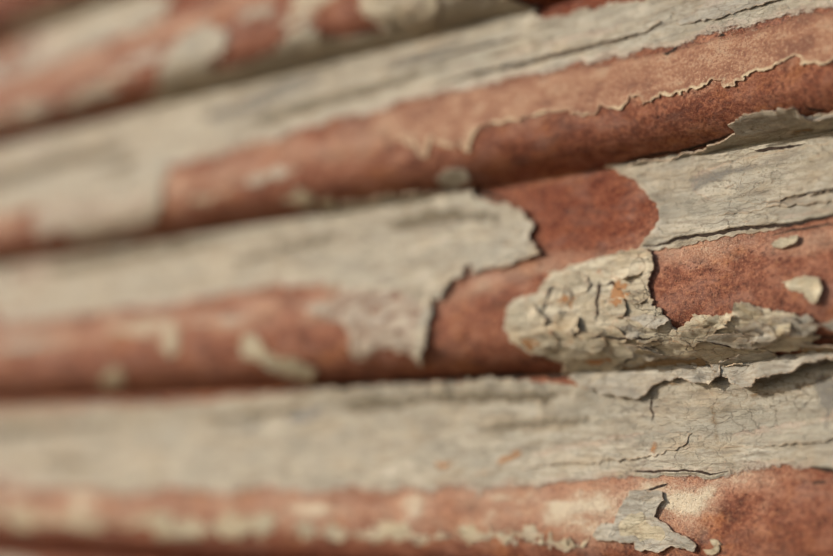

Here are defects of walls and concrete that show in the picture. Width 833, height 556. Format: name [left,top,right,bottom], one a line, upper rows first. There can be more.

crack [624,133,731,163]
crack [755,143,804,152]
peeling [0,0,833,367]
crack [640,187,833,247]
peeling [0,313,833,556]
crack [633,469,729,491]
crack [810,462,833,484]